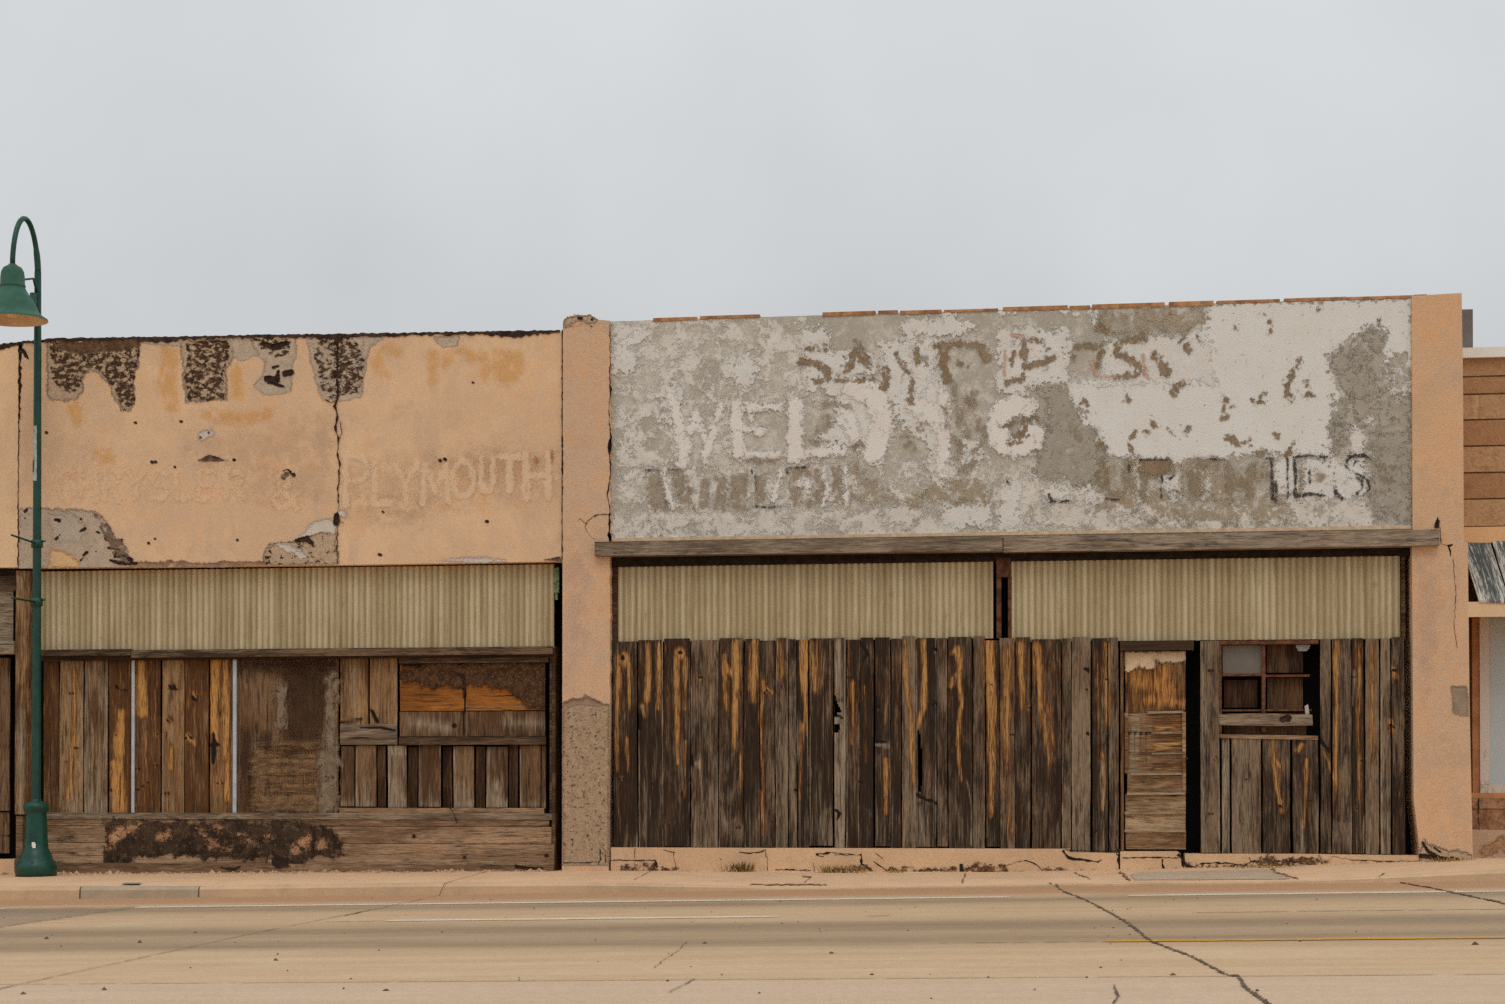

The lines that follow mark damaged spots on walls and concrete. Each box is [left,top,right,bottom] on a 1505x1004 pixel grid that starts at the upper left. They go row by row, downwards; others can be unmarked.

flaking render [45,339,141,424]
peeling [197,428,236,462]
flaking render [180,336,385,403]
crack [325,334,343,564]
peeling [563,298,1412,538]
peeling [19,507,347,569]
flaking render [562,694,679,871]